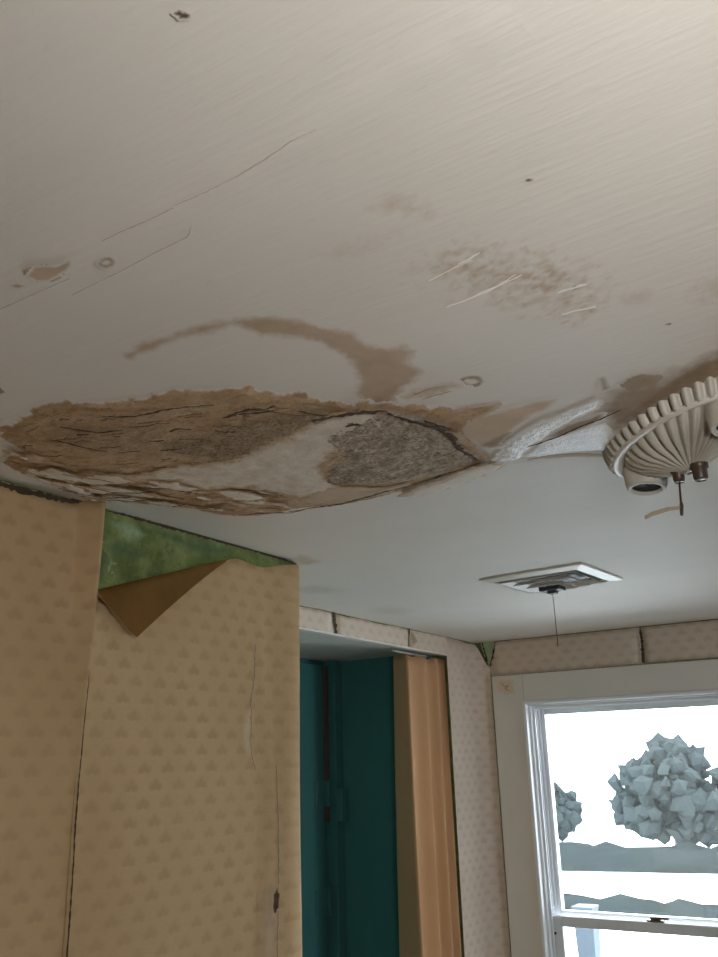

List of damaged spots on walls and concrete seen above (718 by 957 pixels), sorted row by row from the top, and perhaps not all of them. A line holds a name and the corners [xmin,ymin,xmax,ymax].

crack [102,129,316,241]
leakage [116,312,430,405]
leakage [590,346,718,437]
peeling [0,375,621,589]